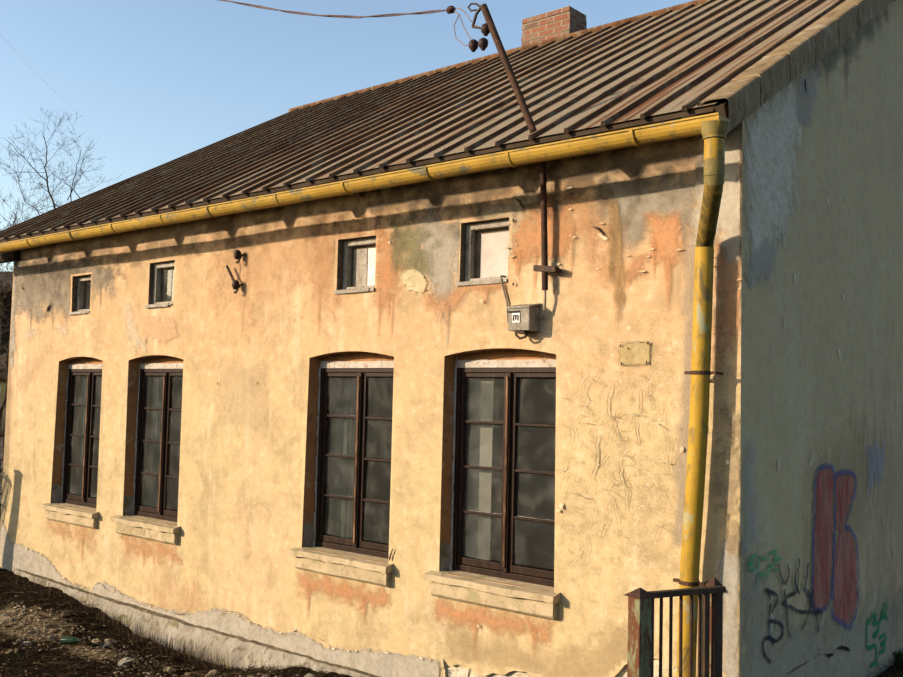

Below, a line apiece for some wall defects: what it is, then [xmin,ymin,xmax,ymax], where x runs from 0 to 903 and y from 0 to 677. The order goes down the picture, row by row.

peeling [400,269,427,293]
water stain [369,167,517,301]
peeling [625,214,684,298]
flaking render [692,140,704,245]
flaking render [713,82,803,359]
water stain [520,141,704,541]
crack [559,340,683,570]
spalling [443,664,531,677]
spalling [654,659,677,677]